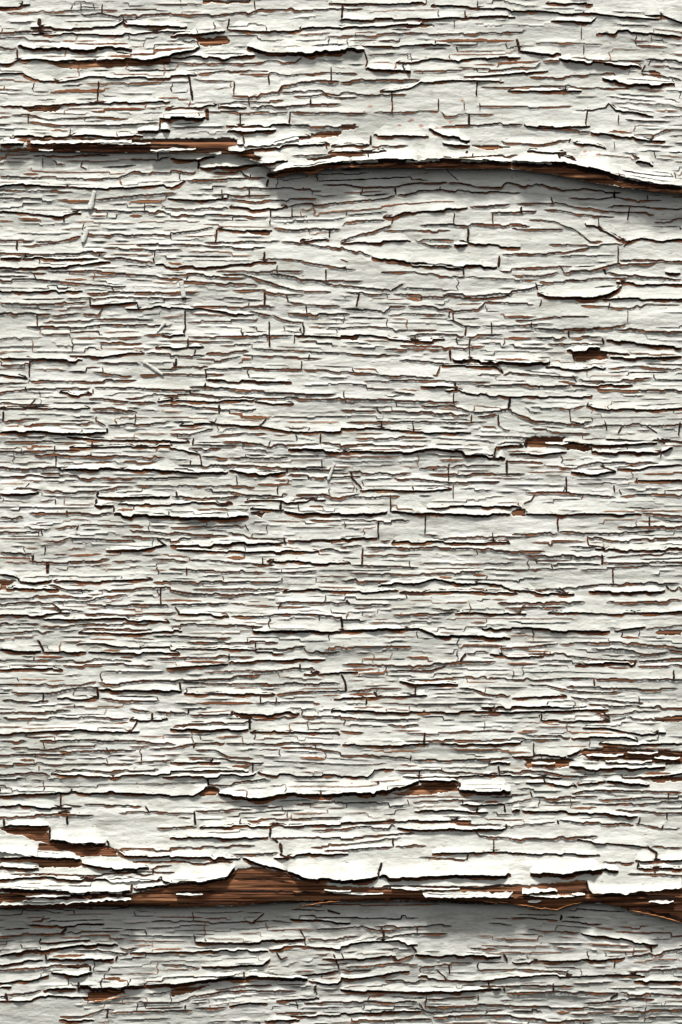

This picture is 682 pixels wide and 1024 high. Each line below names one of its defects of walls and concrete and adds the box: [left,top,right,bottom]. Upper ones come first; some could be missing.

crack [0,1,363,42]
peeling [0,0,682,194]
crack [617,24,682,50]
crack [0,29,682,842]
peeling [0,389,682,484]
peeling [420,333,682,413]
peeling [0,574,682,1024]
crack [0,824,682,1024]